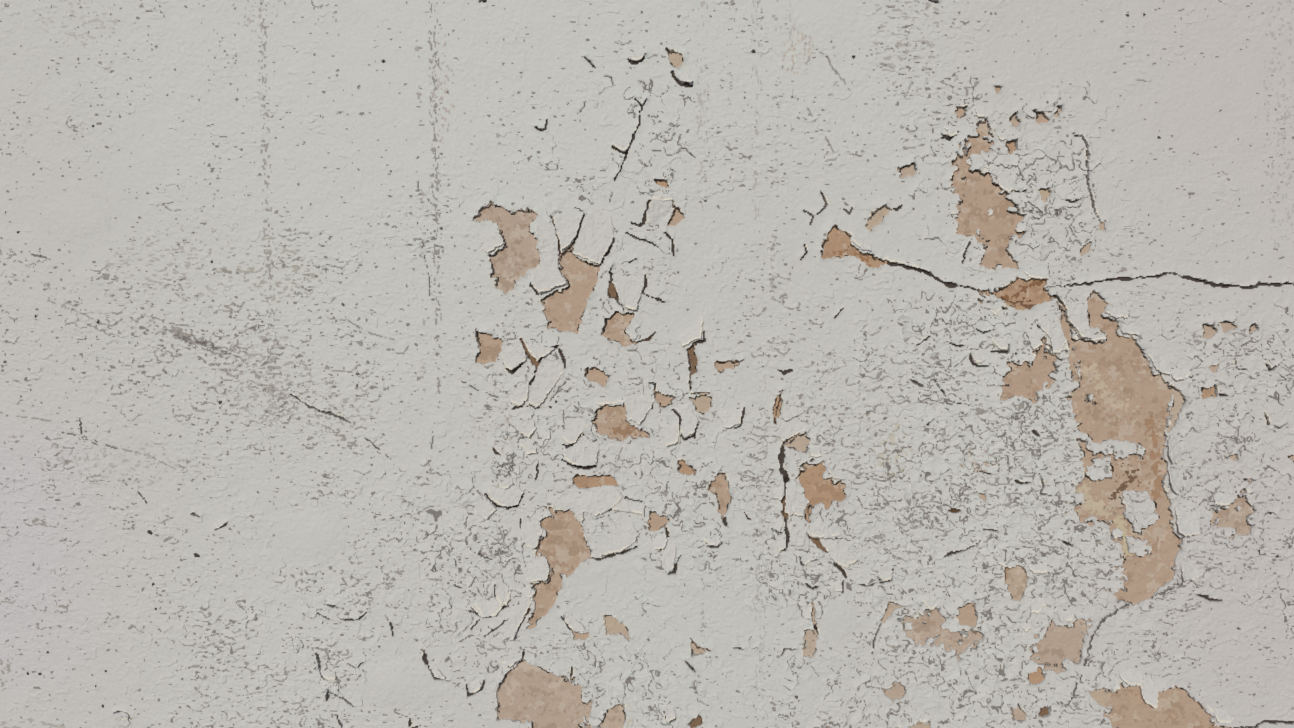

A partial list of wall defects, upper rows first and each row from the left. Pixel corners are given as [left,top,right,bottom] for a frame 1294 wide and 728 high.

peeling [65,203,409,475]
crack [1043,272,1294,341]
crack [1219,358,1280,396]
crack [1263,411,1280,428]
peeling [20,428,105,495]
peeling [6,518,91,553]
peeling [109,479,200,561]
peeling [273,560,327,623]
peeling [146,574,386,728]
crack [1059,581,1222,718]
crack [1220,720,1294,728]